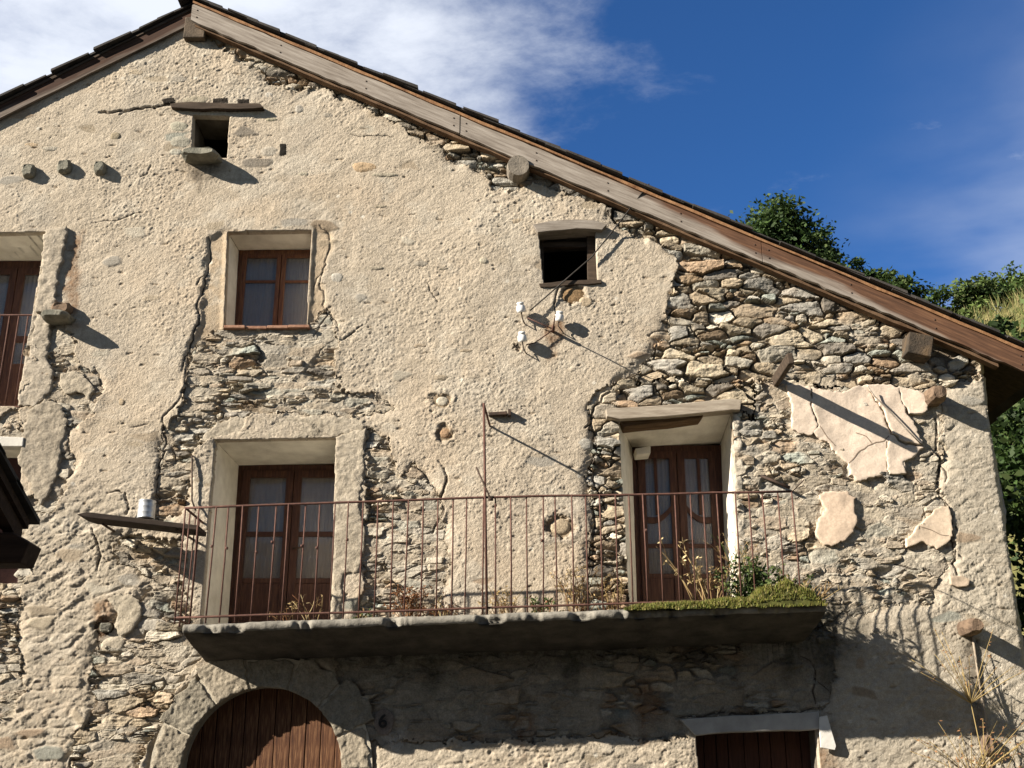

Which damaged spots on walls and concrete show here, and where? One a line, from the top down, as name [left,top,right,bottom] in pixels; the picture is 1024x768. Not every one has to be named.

crack [131,240,211,514]
spalling [154,309,452,618]
crack [313,226,361,340]
spalling [207,36,984,749]
spalling [0,569,33,720]